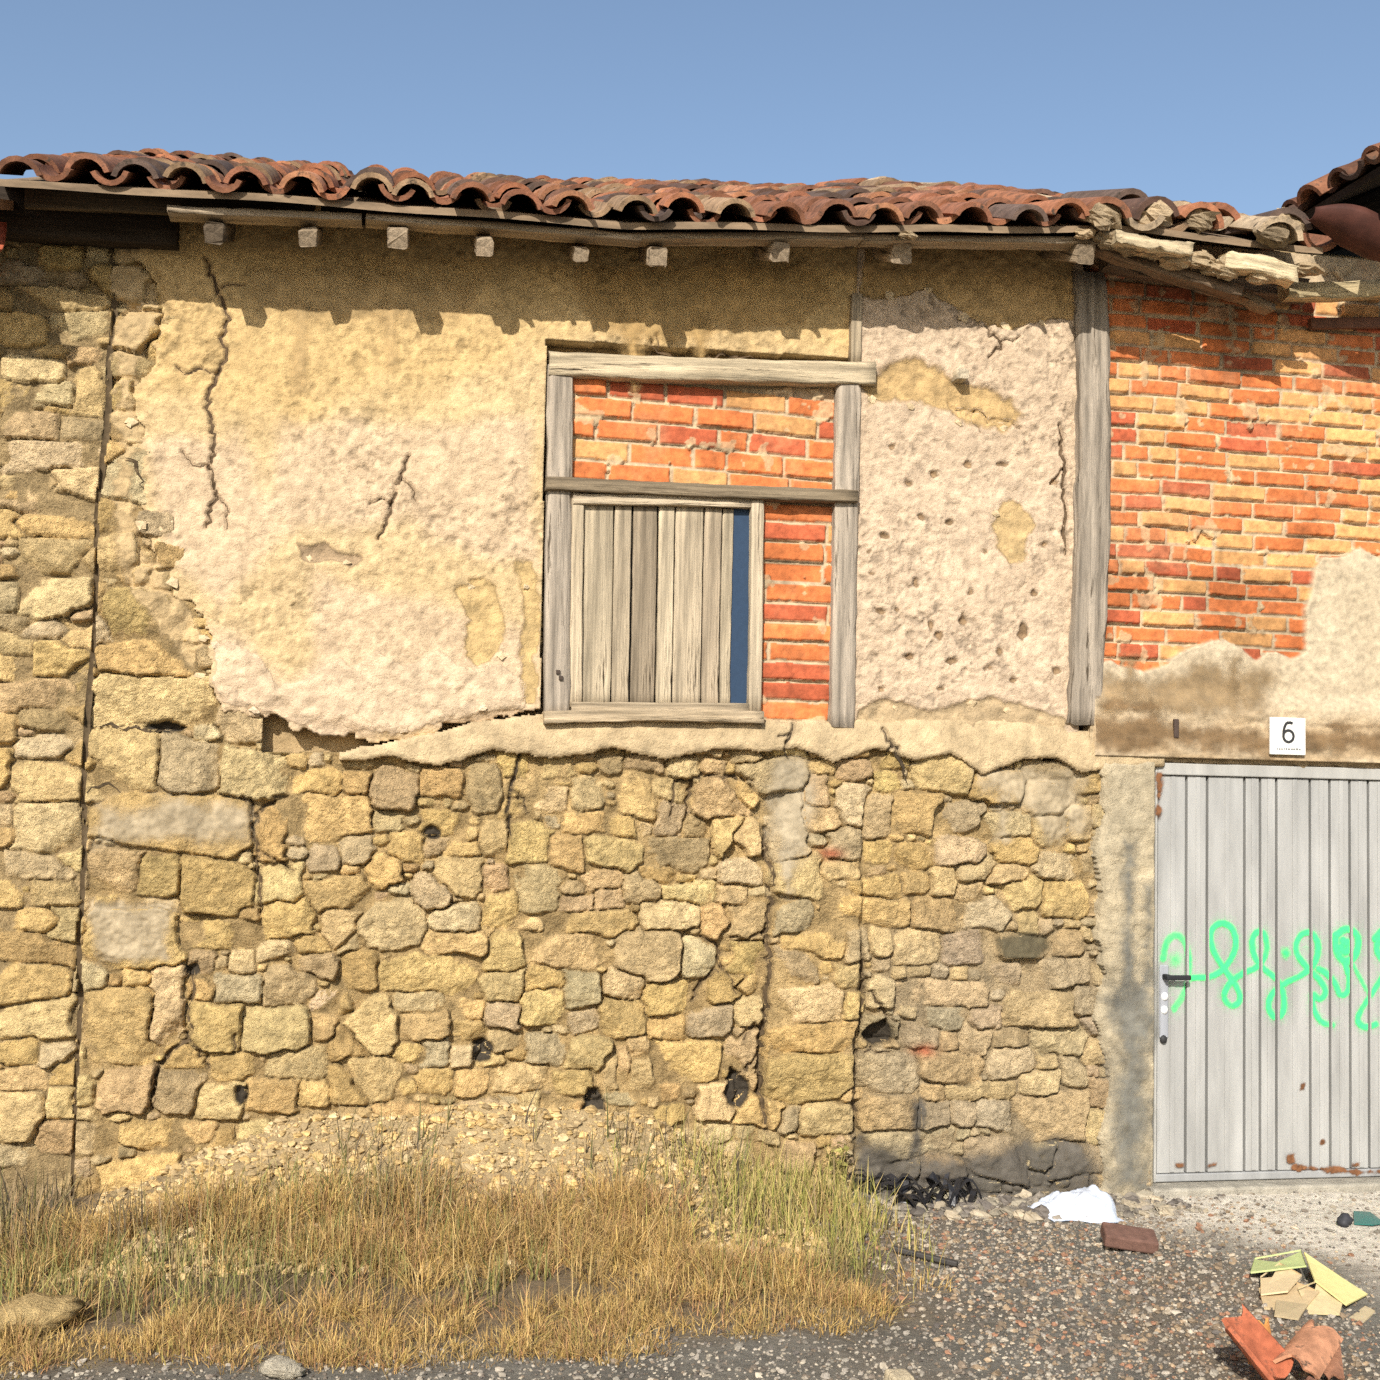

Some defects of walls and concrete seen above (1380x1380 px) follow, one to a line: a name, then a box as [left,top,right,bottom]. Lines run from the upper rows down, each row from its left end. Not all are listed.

crack [176,258,246,527]
flaking render [863,358,1021,432]
crack [370,456,416,540]
crack [70,248,175,1196]
damp [1095,659,1270,752]
damp [1305,723,1380,752]
crack [692,828,776,1130]
rust [1287,1154,1380,1176]